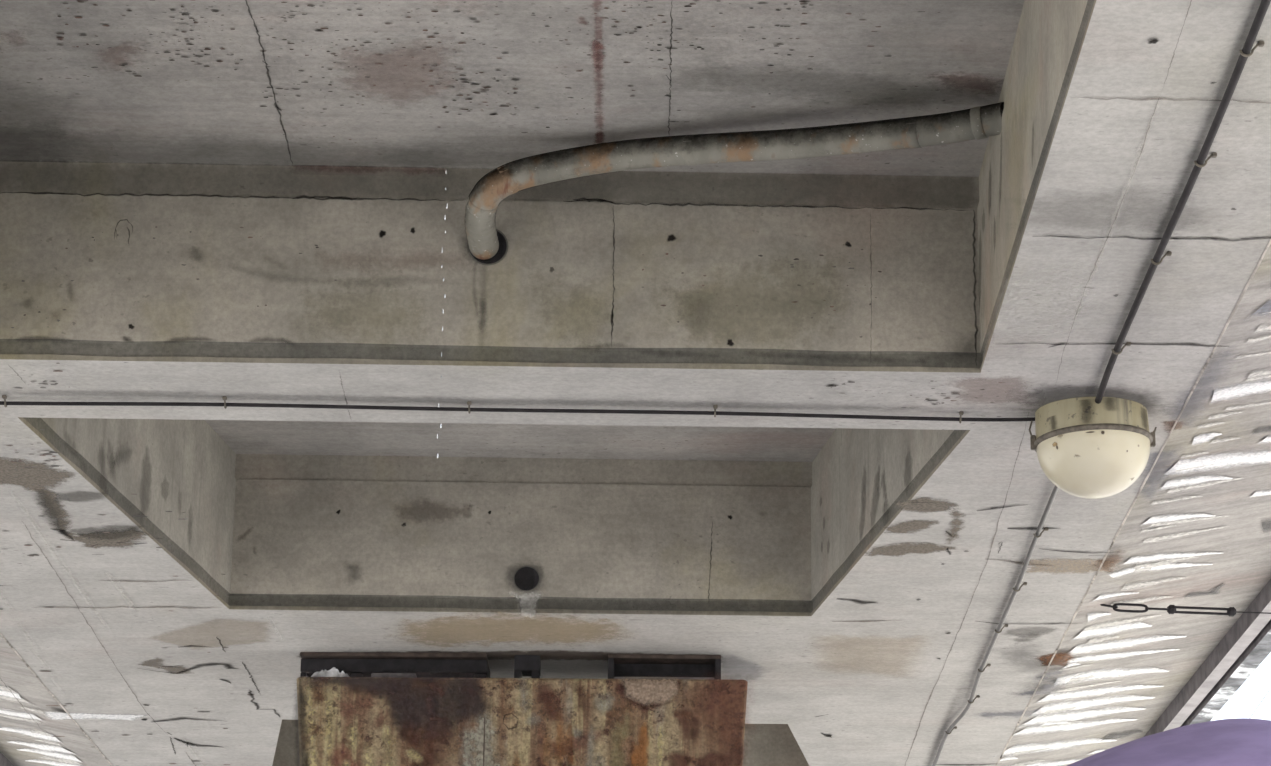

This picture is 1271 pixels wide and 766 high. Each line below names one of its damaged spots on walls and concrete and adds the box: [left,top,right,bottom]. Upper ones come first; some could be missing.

crack [245,0,293,164]
crack [665,2,673,132]
crack [3,192,462,243]
corrosion [296,673,746,766]